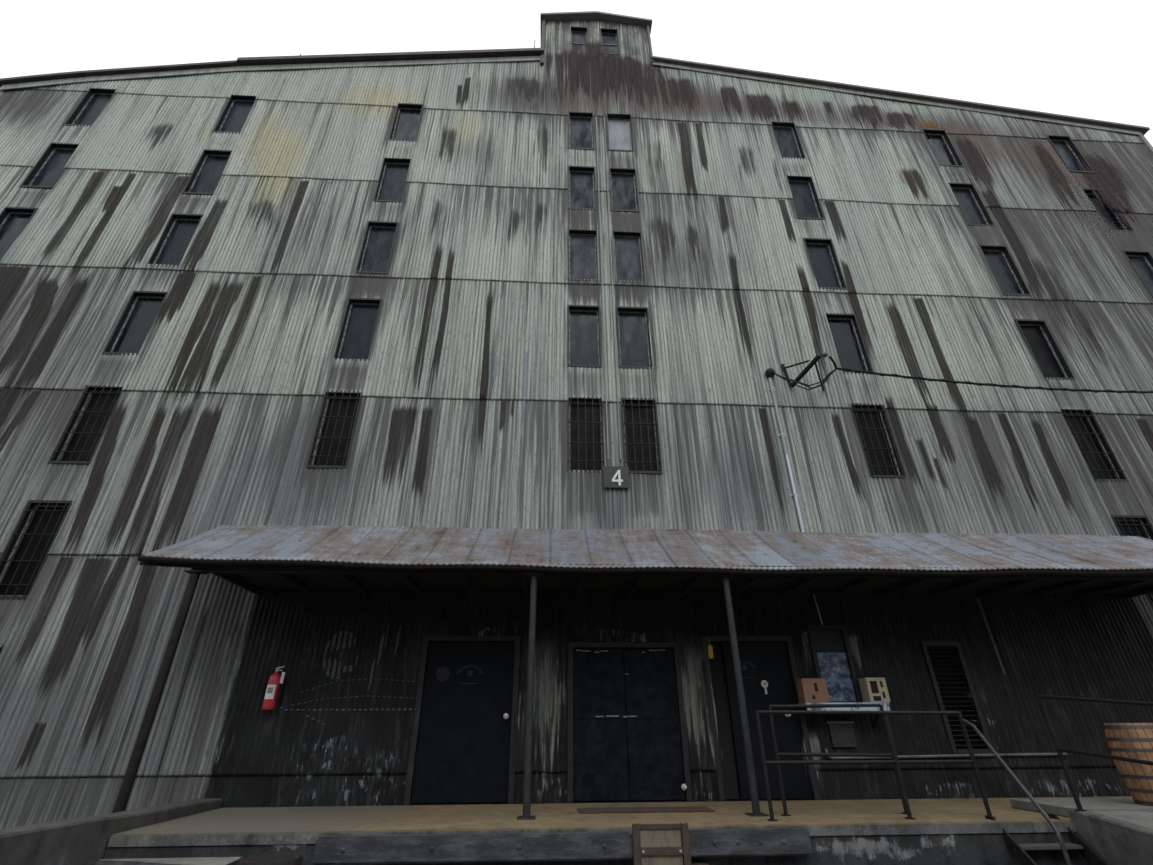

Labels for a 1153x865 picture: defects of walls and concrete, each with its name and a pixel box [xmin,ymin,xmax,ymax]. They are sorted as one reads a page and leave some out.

corrosion [533,42,699,112]
corrosion [719,87,803,124]
corrosion [823,102,945,132]
corrosion [899,169,929,206]
corrosion [1036,147,1086,230]
damp [0,171,309,757]
damp [383,202,455,501]
damp [477,295,493,453]
damp [797,267,867,503]
damp [885,305,956,497]
damp [913,297,1005,503]
peeling [817,834,955,860]